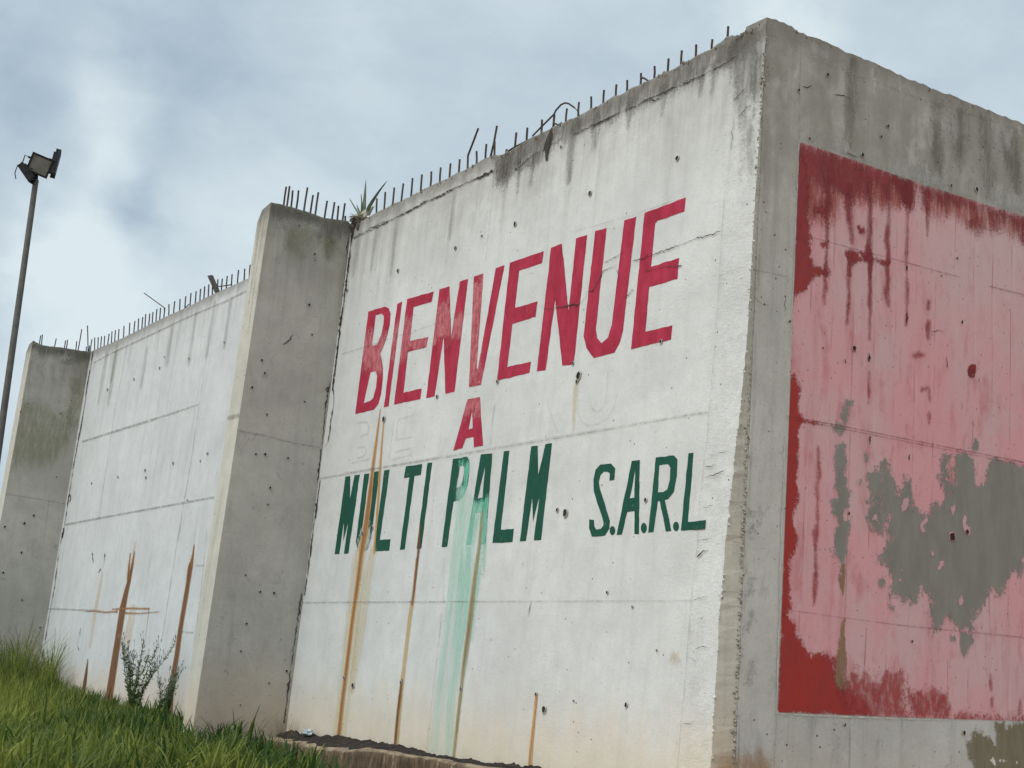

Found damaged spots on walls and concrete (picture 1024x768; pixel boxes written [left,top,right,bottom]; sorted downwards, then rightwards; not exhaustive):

water stain [496,30,757,179]
crack [284,57,735,722]
corrosion [86,551,151,701]
corrosion [166,546,194,713]
corrosion [337,412,384,736]
corrosion [394,523,421,745]
corrosion [452,512,483,757]
corrosion [528,696,537,766]
peeling [828,399,1024,658]
peeling [908,688,1024,768]